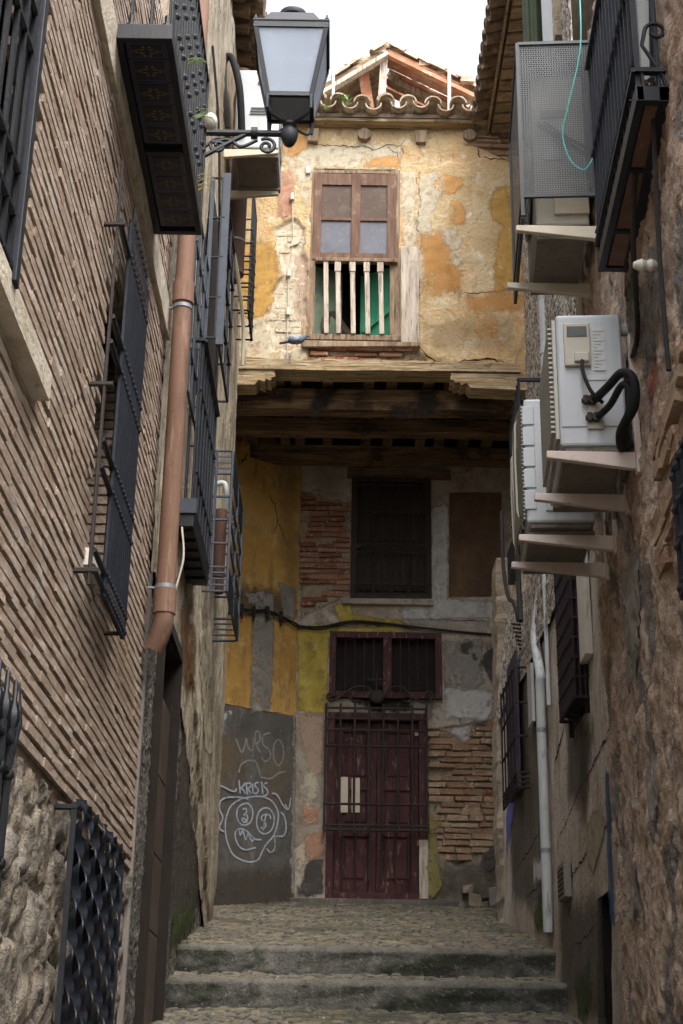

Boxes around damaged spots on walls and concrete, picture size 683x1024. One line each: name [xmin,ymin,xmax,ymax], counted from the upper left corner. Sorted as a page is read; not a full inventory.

flaking render [239,129,465,361]
crack [316,139,422,250]
flaking render [489,186,523,292]
flaking render [245,490,496,898]